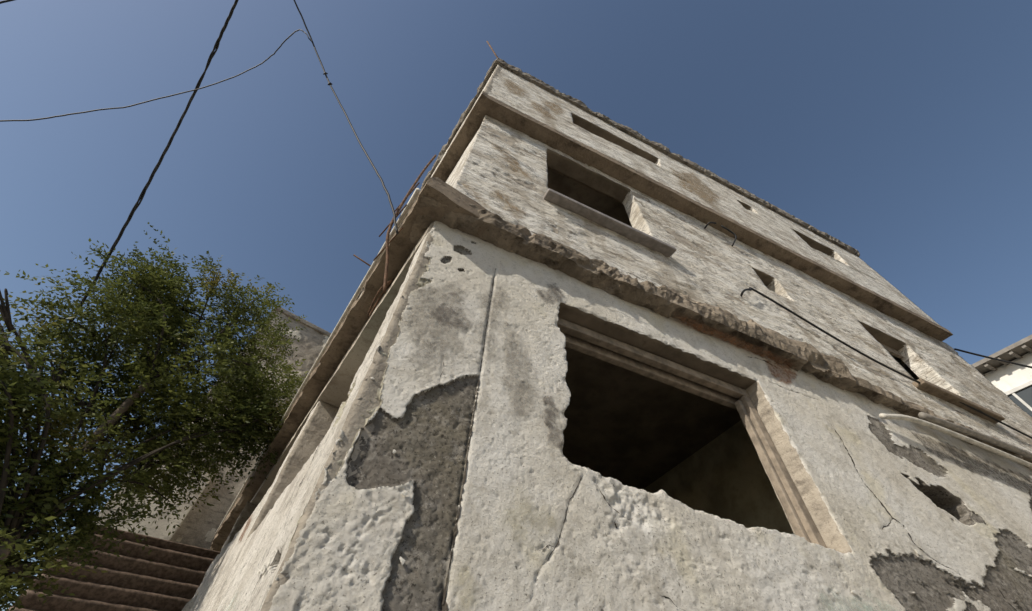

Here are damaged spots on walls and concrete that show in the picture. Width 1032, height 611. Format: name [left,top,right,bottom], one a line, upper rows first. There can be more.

flaking render [416,241,476,287]
flaking render [631,191,715,256]
flaking render [327,312,480,611]
crack [532,475,626,594]
crack [832,426,951,569]
flaking render [867,415,948,477]
flaking render [870,511,1032,611]